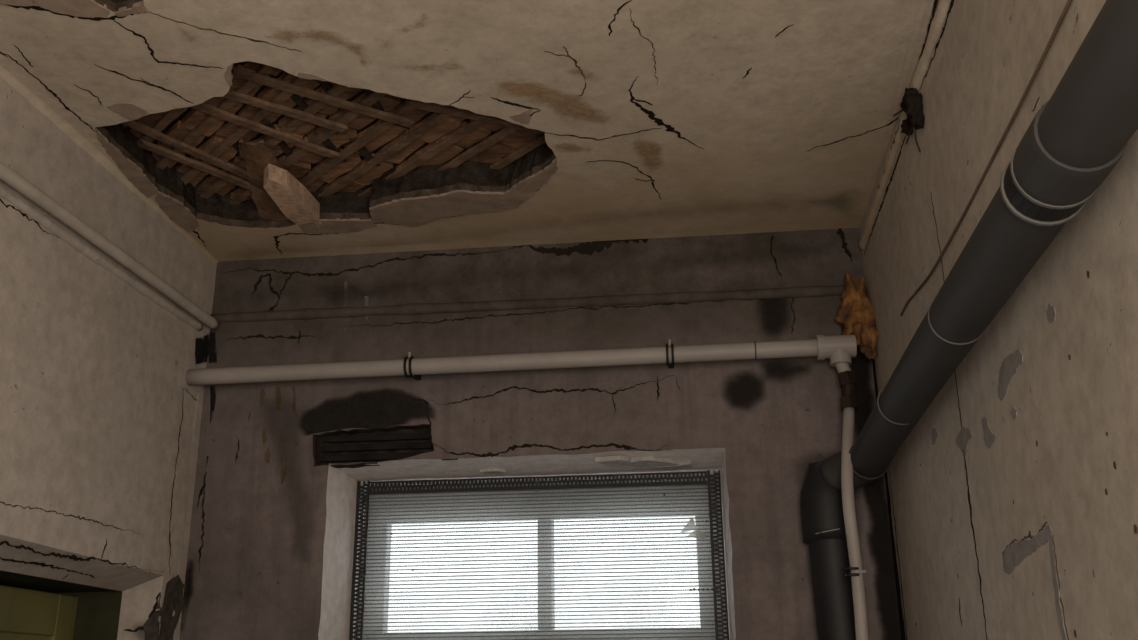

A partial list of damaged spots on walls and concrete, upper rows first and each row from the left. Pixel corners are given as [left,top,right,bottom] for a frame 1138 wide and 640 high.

crack [0,3,301,132]
spalling [95,61,557,234]
crack [450,0,700,198]
crack [919,0,954,89]
crack [222,233,764,344]
crack [0,389,240,580]
crack [432,442,668,457]
crack [433,375,680,414]
crack [955,373,988,640]
peeling [997,350,1023,419]
spalling [124,575,184,640]
peeling [1002,522,1077,640]